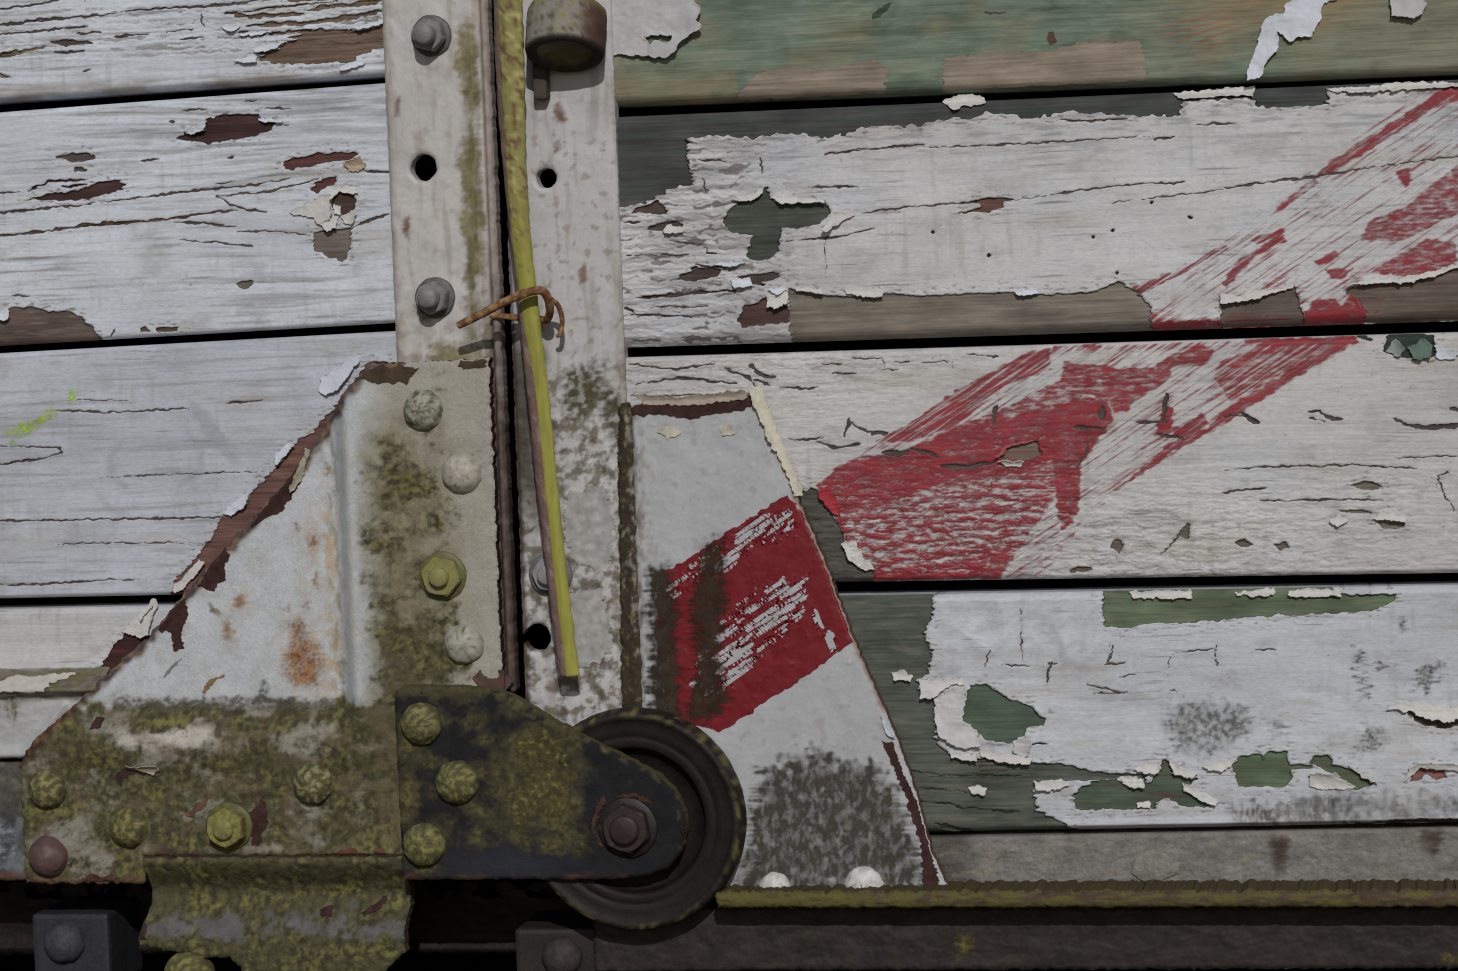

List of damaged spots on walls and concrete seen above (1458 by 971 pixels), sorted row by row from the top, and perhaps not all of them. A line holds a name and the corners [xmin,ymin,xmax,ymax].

peeling [221,0,384,71]
peeling [176,114,289,145]
peeling [612,0,1458,234]
peeling [624,186,1154,342]
crack [0,445,63,465]
crack [55,399,187,413]
crack [1069,393,1184,476]
crack [1222,407,1458,511]
crack [0,515,246,586]
peeling [100,357,388,670]
corrosion [287,622,319,685]
peeling [801,485,1407,832]